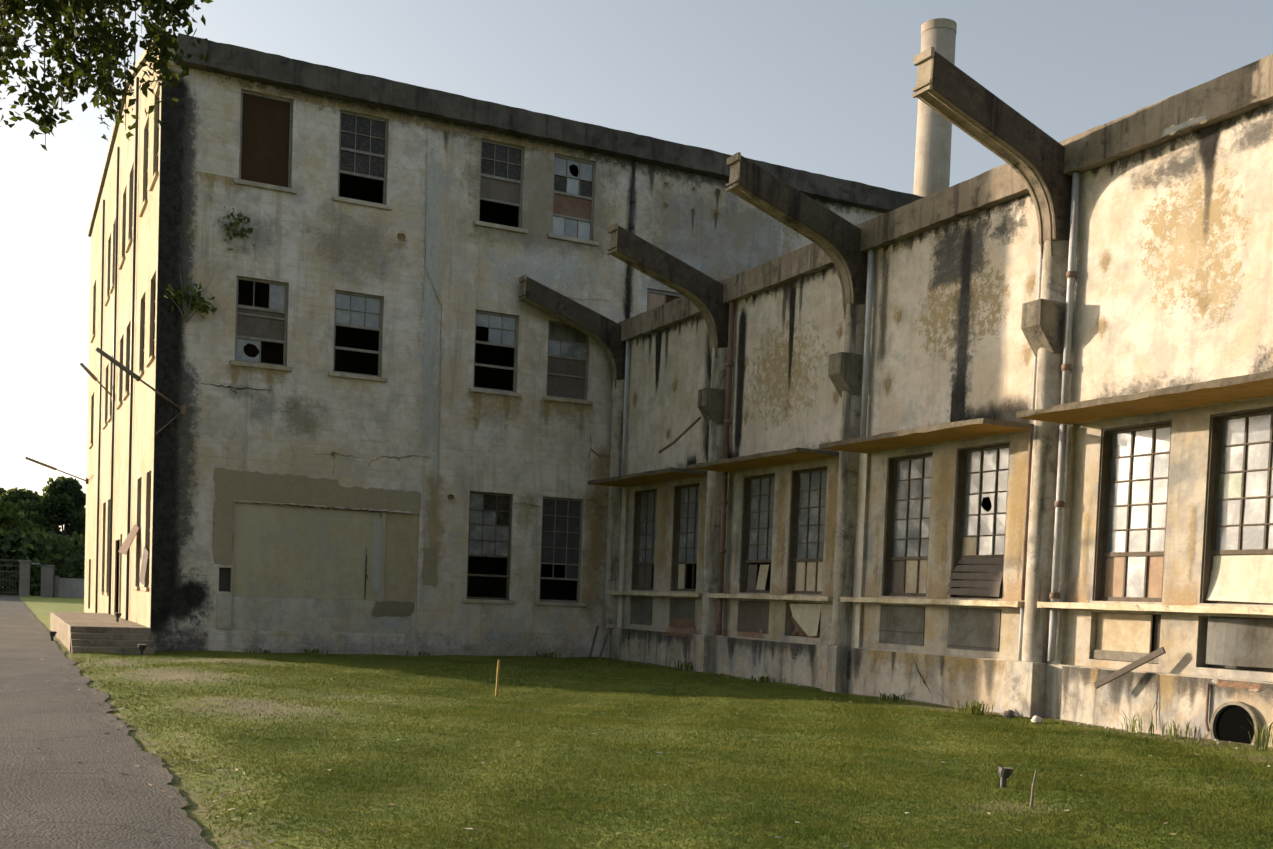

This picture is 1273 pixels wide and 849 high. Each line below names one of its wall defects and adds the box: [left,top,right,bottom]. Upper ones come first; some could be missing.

leakage [1091,103,1273,234]
leakage [151,70,209,651]
crack [201,383,271,393]
leakage [878,194,1033,424]
leakage [984,659,994,691]
leakage [1062,666,1273,704]